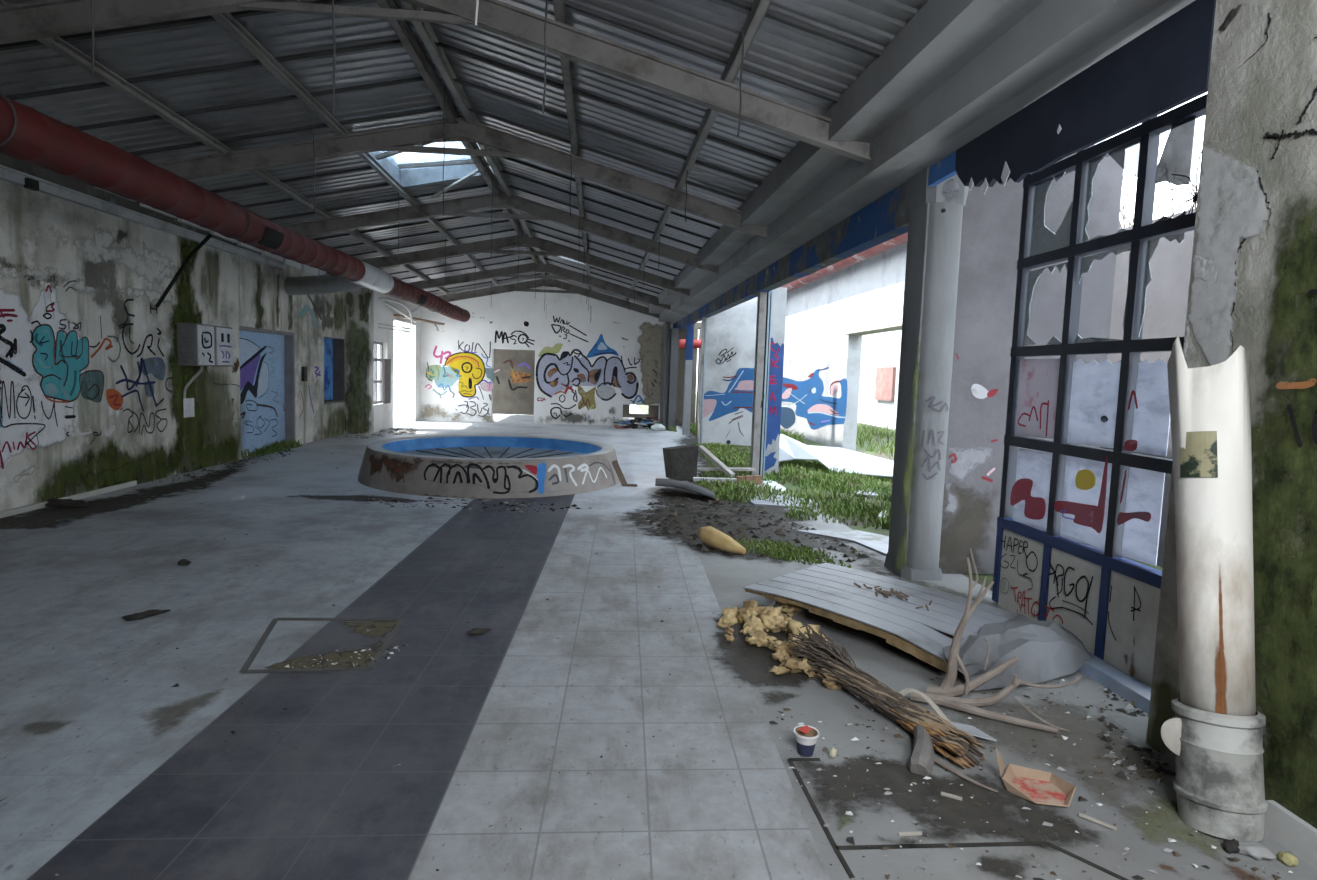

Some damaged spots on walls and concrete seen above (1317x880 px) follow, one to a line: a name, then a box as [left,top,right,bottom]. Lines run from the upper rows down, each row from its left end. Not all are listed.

crack [1240,13,1271,67]
leakage [171,248,201,328]
peeling [1183,145,1268,366]
crack [1230,86,1317,355]
leakage [177,379,202,456]